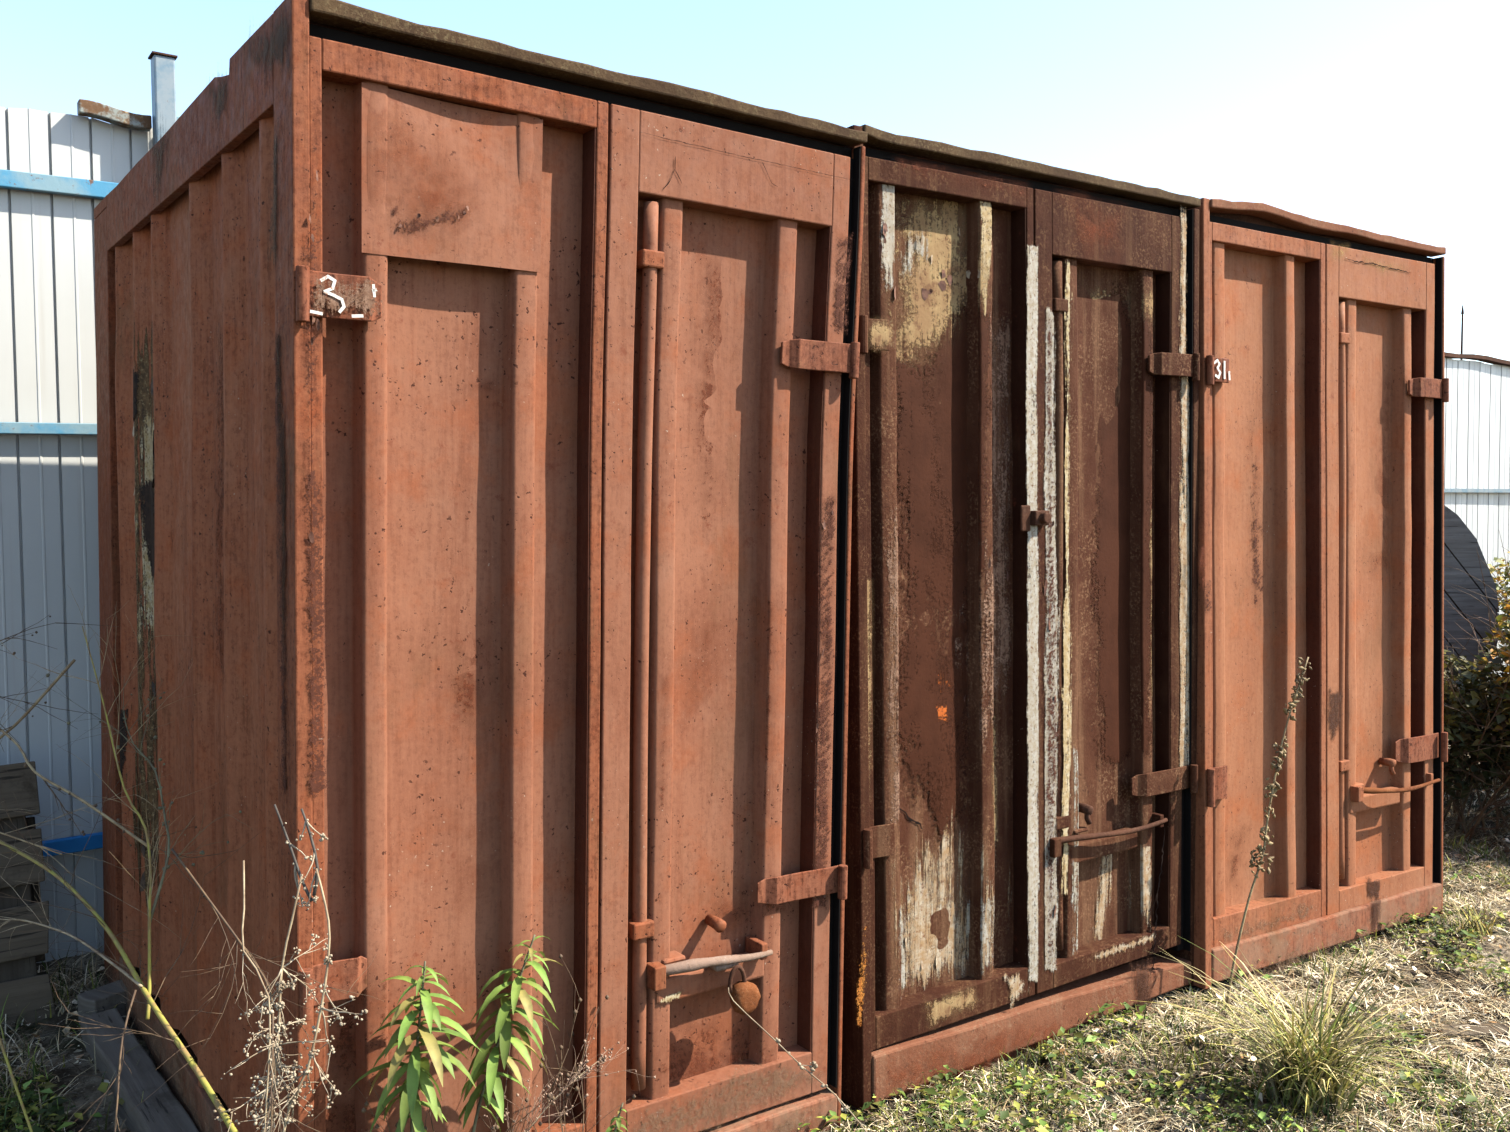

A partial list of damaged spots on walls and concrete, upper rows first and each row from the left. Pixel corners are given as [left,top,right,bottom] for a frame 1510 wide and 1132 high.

peeling [120,313,159,915]
corrosion [274,293,333,797]
peeling [869,184,992,381]
corrosion [888,304,992,840]
peeling [893,245,1155,1024]
corrosion [1091,280,1153,770]
corrosion [856,926,868,1025]